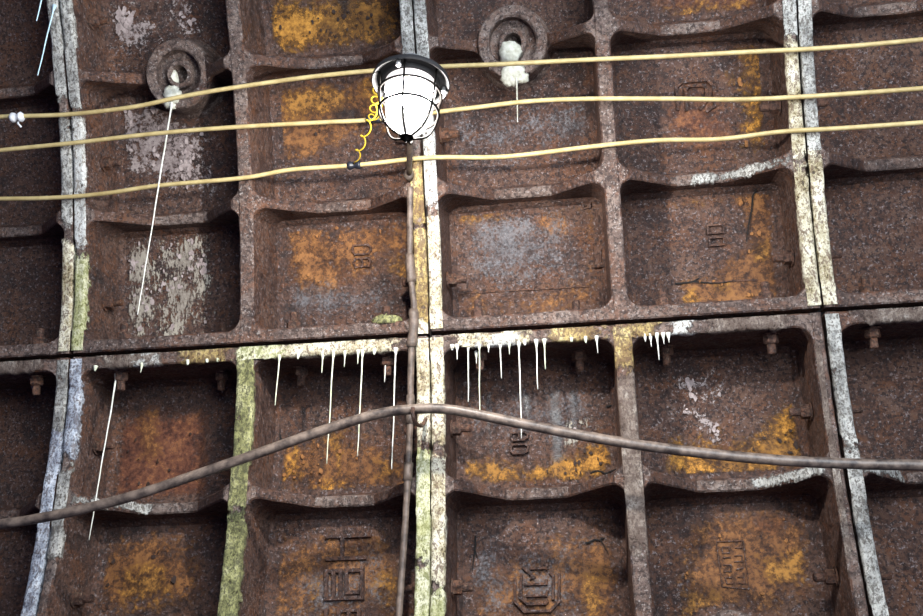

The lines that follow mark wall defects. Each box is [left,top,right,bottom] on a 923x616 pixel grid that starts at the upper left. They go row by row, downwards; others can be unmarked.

corrosion [272,0,400,51]
leakage [399,0,429,58]
leakage [499,41,529,87]
corrosion [281,78,389,160]
leakage [171,236,198,267]
corrosion [682,193,776,303]
leakage [410,115,533,616]
corrosion [282,433,404,490]
corrosion [465,444,610,482]
leakage [543,314,789,559]
corrosion [670,409,801,473]
corrosion [679,510,809,615]